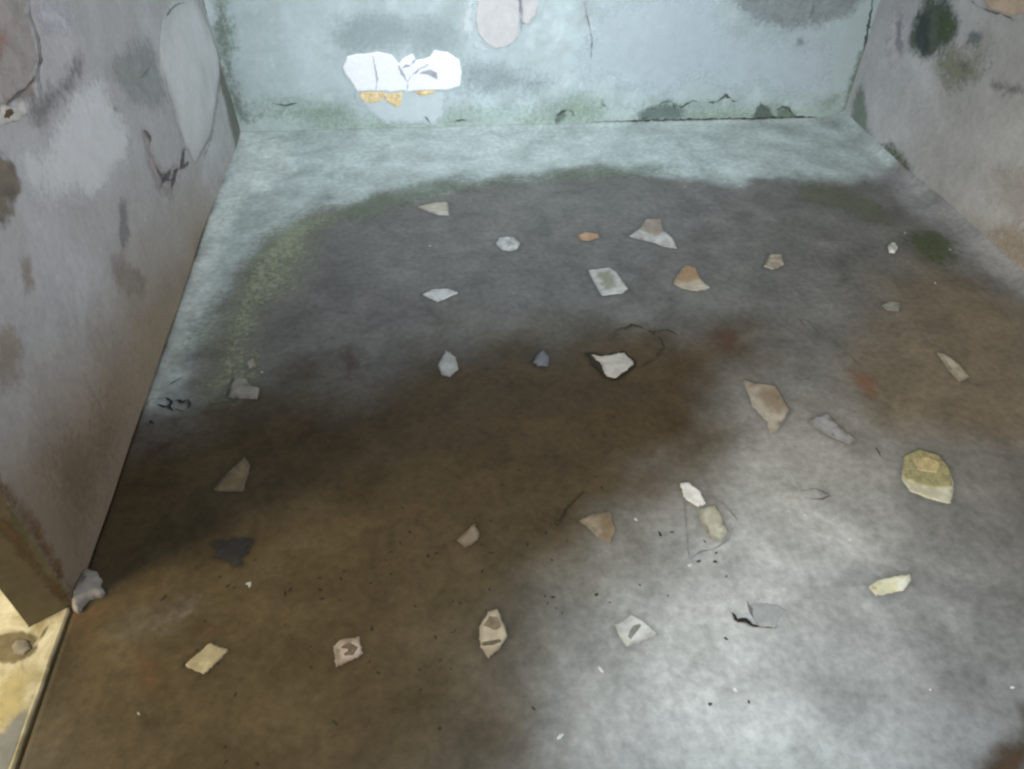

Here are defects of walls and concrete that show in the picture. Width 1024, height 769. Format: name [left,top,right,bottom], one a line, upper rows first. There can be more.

peeling [462,0,539,49]
leakage [896,0,957,56]
peeling [343,50,462,107]
leakage [639,104,682,121]
crack [143,128,189,187]
leakage [120,202,130,246]
crack [612,323,678,367]
spalling [212,537,254,566]